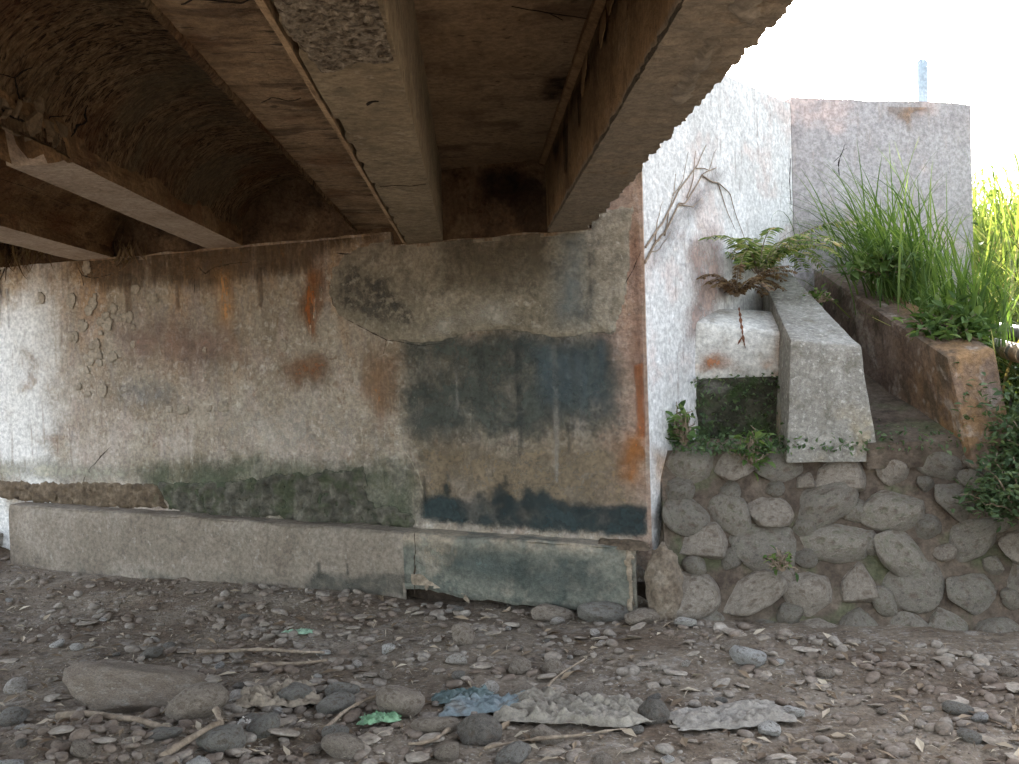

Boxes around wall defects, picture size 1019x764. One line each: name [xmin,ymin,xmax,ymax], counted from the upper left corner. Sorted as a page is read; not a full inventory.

crack [181,0,249,8]
spalling [273,0,394,73]
crack [0,67,88,148]
water stain [340,267,410,321]
water stain [404,304,662,538]
corrosion [628,364,644,463]